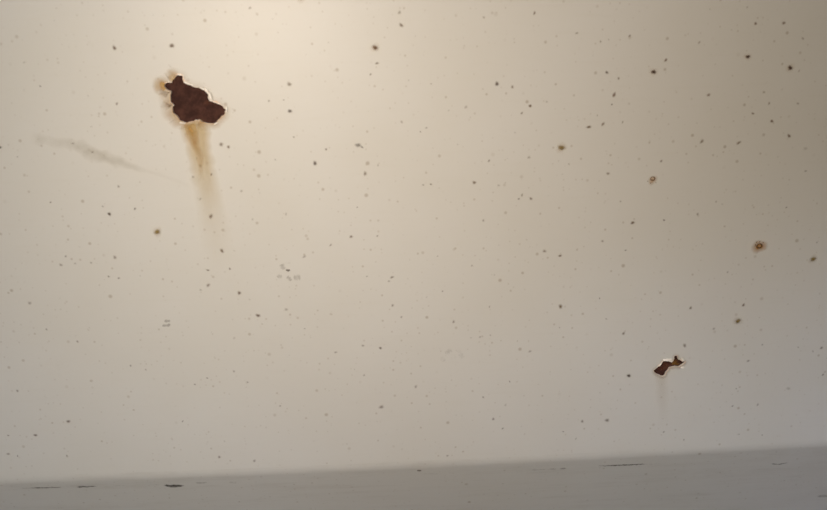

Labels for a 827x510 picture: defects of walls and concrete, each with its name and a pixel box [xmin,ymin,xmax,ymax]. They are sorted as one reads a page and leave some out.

corrosion [159,73,228,134]